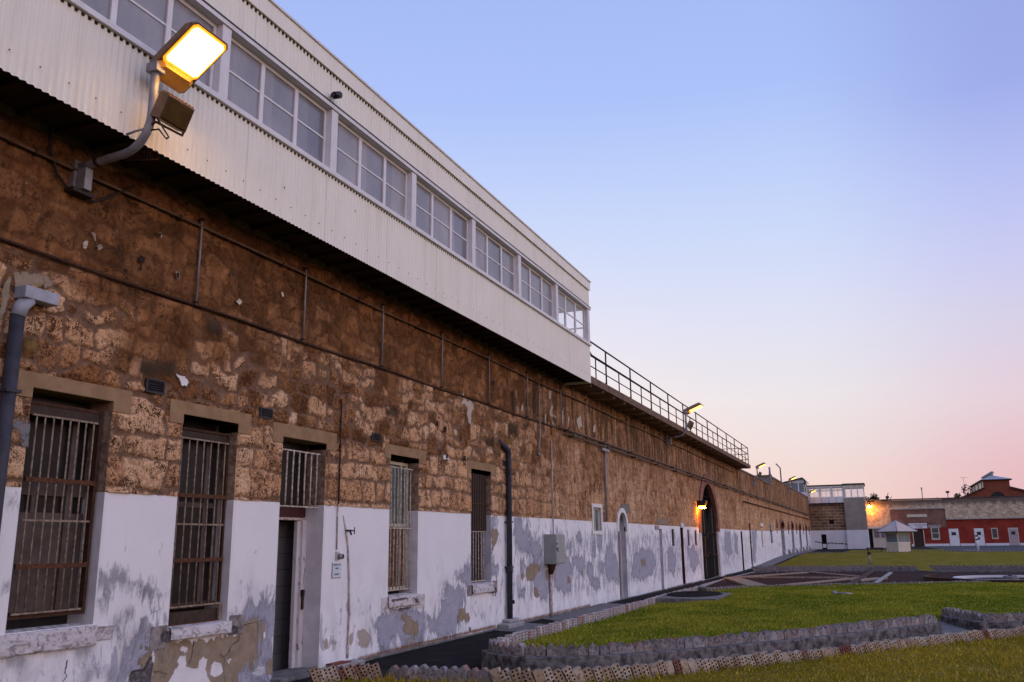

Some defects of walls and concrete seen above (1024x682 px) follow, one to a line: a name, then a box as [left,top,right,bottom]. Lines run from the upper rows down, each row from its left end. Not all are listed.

peeling [513,518,699,600]
spalling [117,593,275,682]
peeling [377,563,471,652]